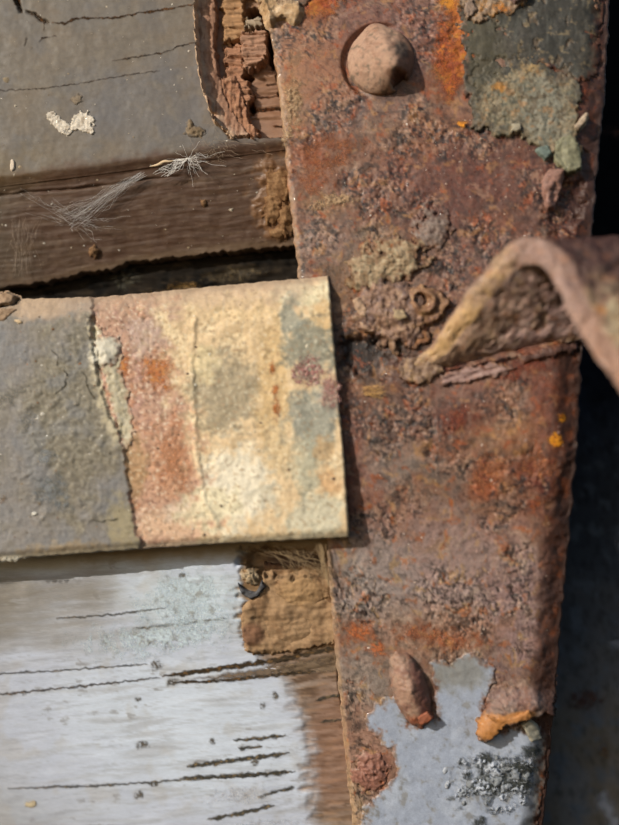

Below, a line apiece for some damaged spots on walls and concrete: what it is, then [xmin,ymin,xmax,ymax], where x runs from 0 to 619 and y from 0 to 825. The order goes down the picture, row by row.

crack [13,0,193,44]
peeling [255,0,311,31]
corrosion [435,0,528,95]
peeling [455,0,605,176]
corrosion [541,169,564,211]
spalling [0,290,23,324]
corrosion [396,341,583,388]
crack [64,609,224,629]
crack [0,646,334,695]
corrosion [475,674,558,743]
peeling [359,651,551,825]
crack [17,734,294,821]